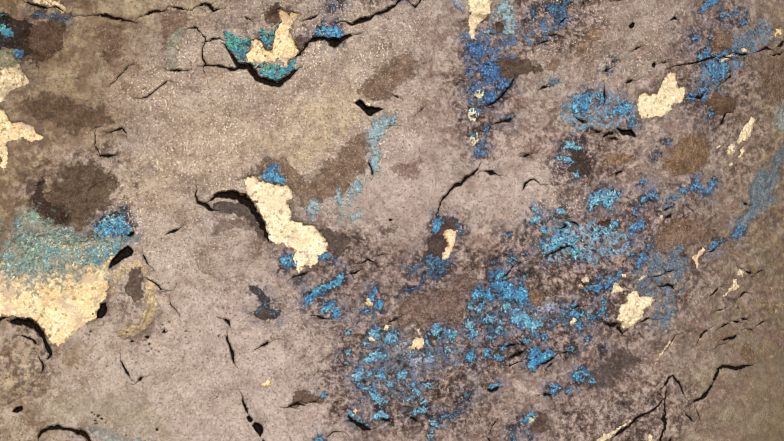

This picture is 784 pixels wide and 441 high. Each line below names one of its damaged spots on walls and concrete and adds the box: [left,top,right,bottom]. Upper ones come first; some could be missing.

spalling [0,12,43,170]
crack [24,0,421,98]
spalling [223,8,300,82]
spalling [607,0,782,128]
crack [195,186,272,243]
spalling [244,162,335,278]
crack [436,161,500,217]
crack [0,317,52,371]
spalling [0,209,133,347]
spalling [344,172,717,441]
crack [38,425,91,441]
crack [611,364,753,441]